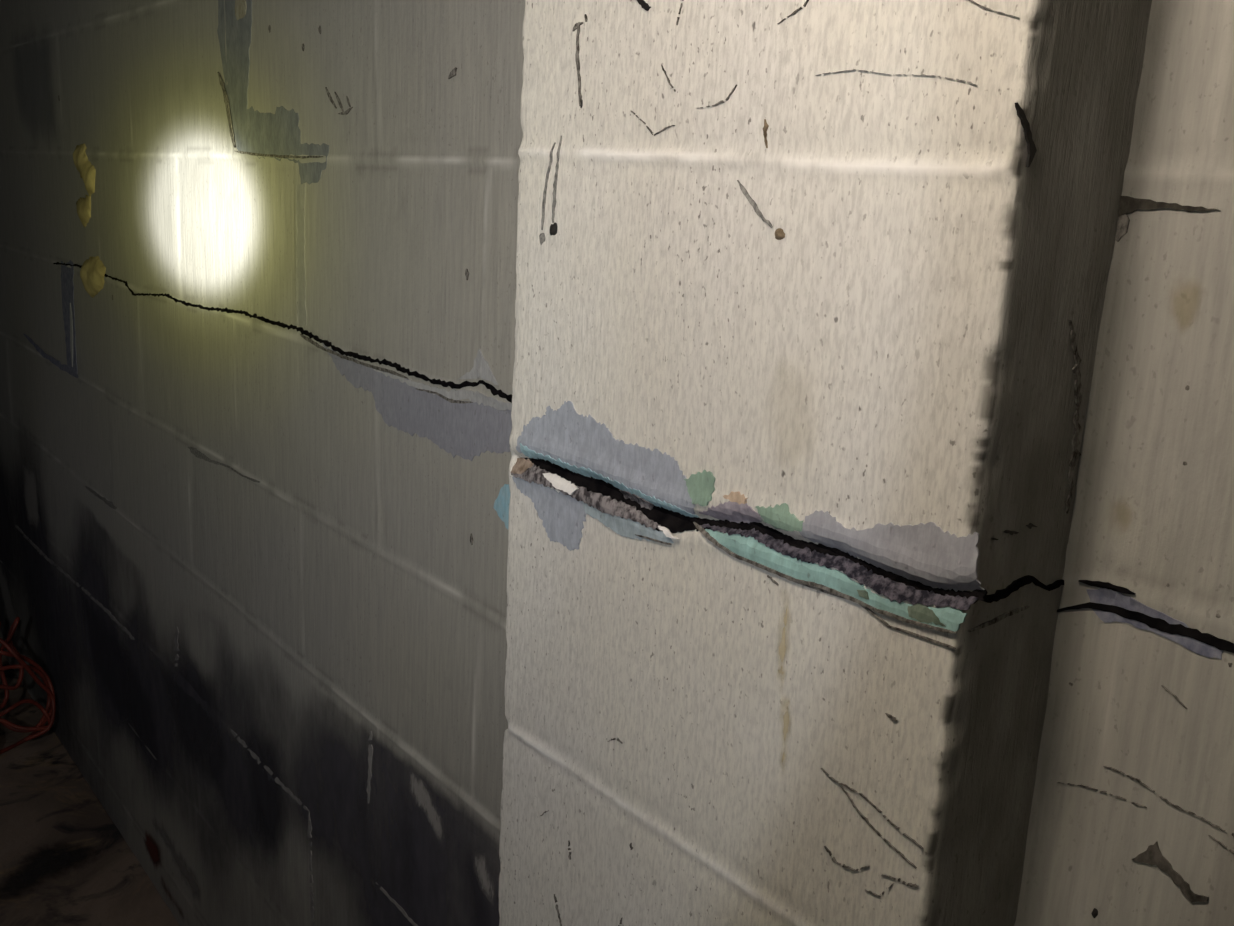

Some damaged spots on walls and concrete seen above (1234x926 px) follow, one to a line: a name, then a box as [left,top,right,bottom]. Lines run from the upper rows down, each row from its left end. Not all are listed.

crack [777,0,809,24]
peeling [217,0,329,326]
crack [631,111,675,136]
crack [700,85,737,108]
crack [816,69,976,85]
crack [53,262,512,404]
peeling [322,343,984,632]
crack [511,457,1234,653]
damp [0,464,501,926]
crack [821,768,923,897]
crack [1057,766,1234,854]
spalling [1132,842,1209,903]